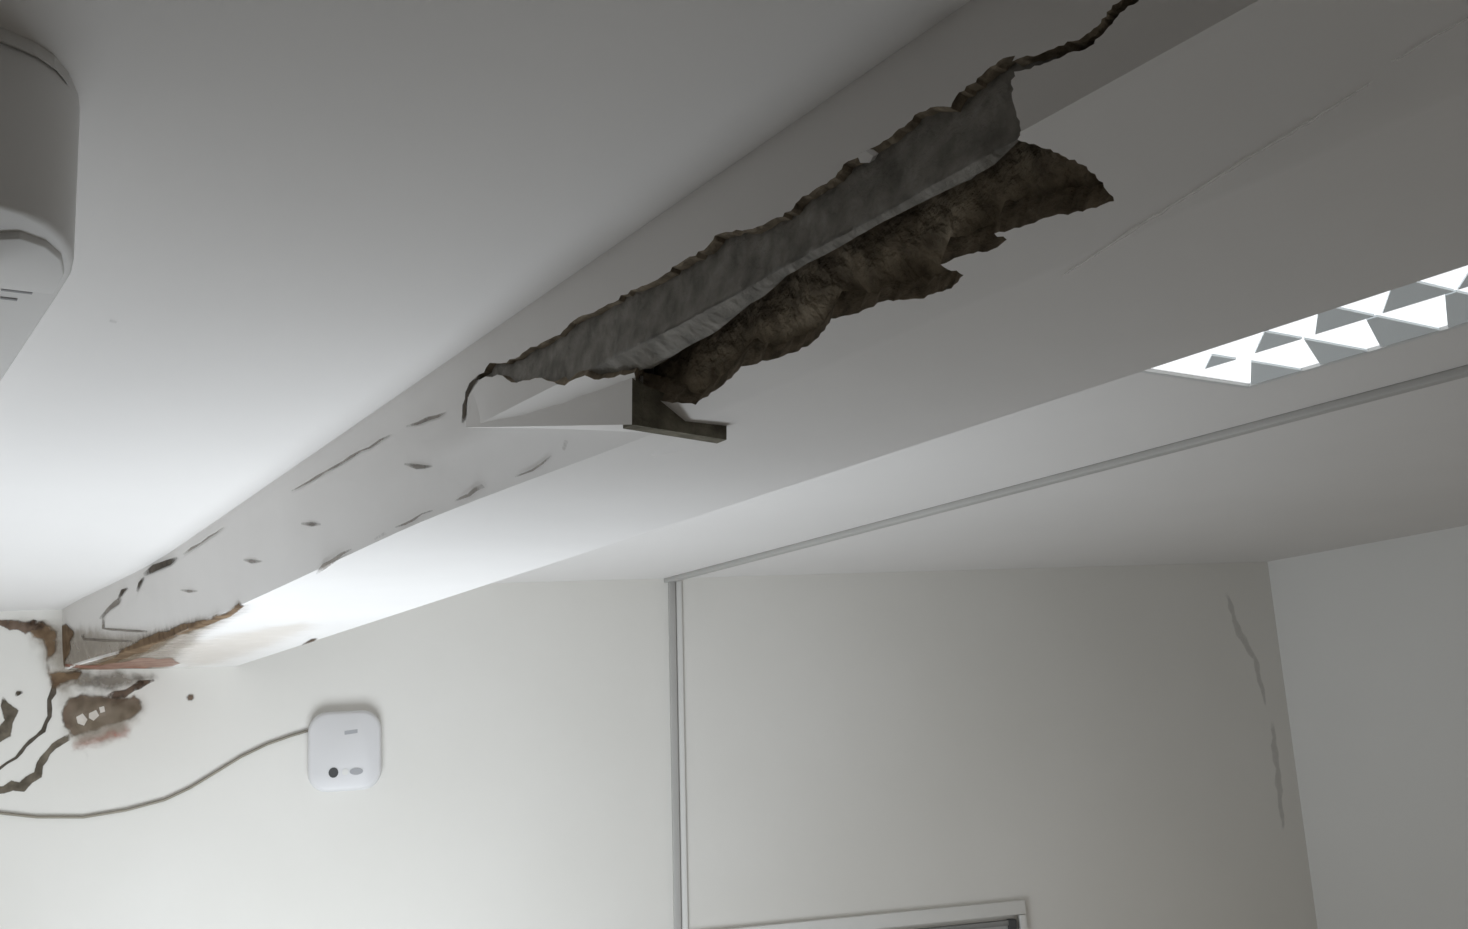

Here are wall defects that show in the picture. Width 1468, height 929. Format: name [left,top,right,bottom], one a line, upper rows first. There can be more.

spalling [466,0,1139,456]
crack [295,376,479,489]
crack [518,459,547,476]
crack [399,487,478,526]
crack [319,550,349,571]
crack [0,530,220,794]
rust [74,703,136,739]